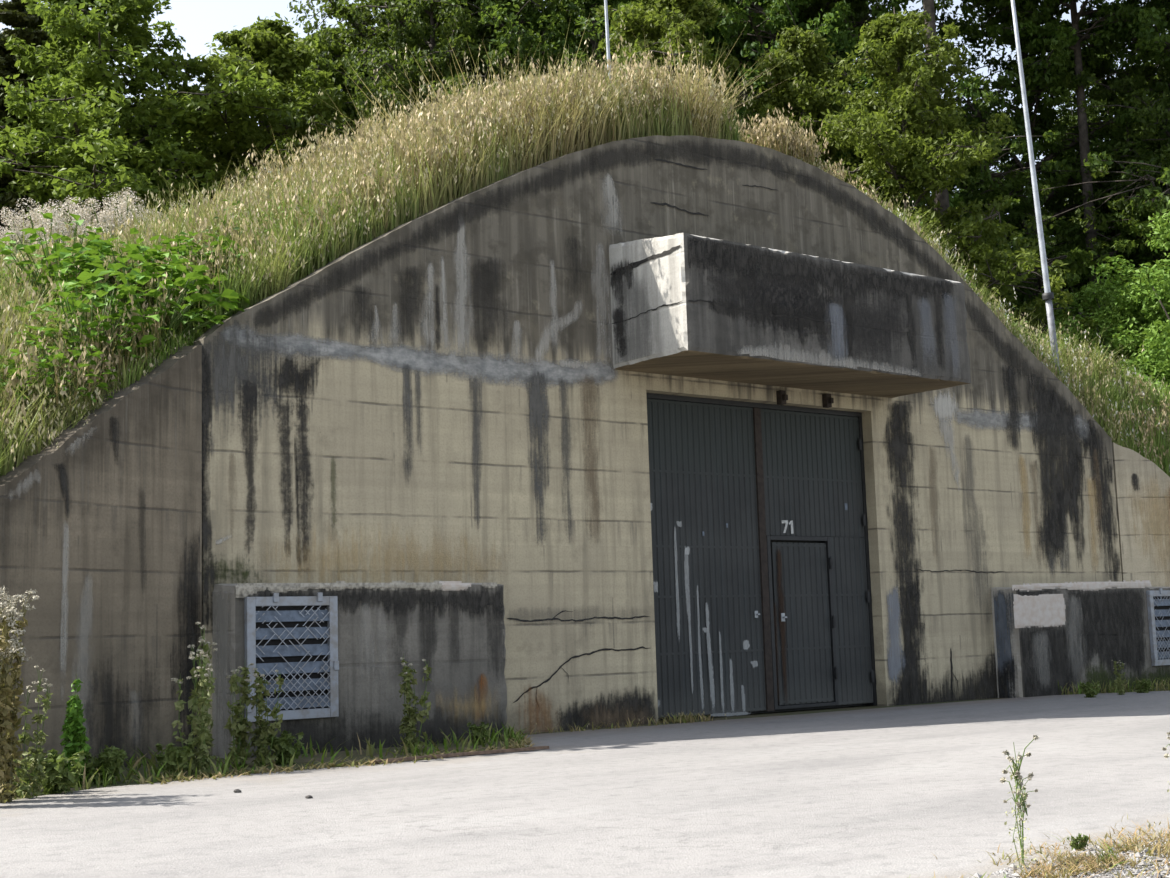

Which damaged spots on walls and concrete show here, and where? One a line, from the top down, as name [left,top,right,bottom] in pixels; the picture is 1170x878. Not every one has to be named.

water stain [201,142,949,626]
water stain [58,464,69,513]
water stain [885,304,1146,706]
water stain [248,586,504,662]
crack [507,610,650,622]
crack [513,646,648,703]